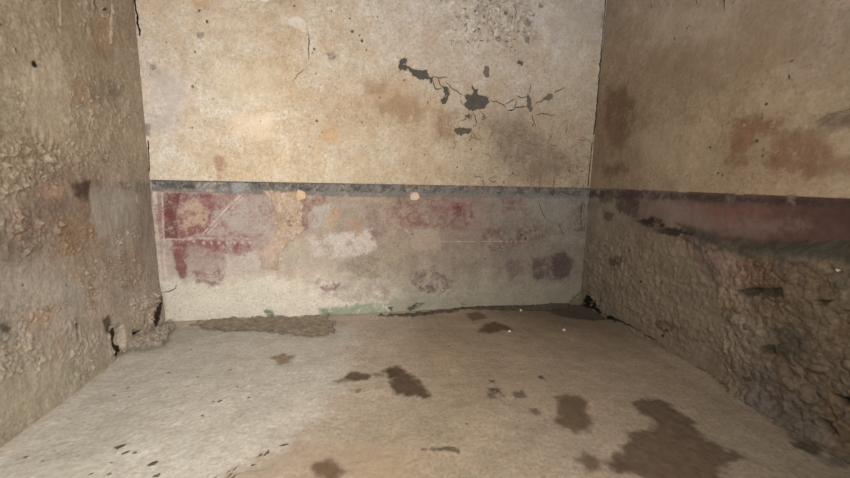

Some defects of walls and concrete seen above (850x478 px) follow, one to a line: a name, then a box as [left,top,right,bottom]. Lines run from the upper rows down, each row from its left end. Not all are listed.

spalling [396,56,451,105]
spalling [452,82,491,141]
crack [432,0,607,246]
peeling [260,190,306,270]
damp [386,367,428,398]
damp [557,395,591,430]
damp [611,400,742,478]
flaking render [657,225,850,464]